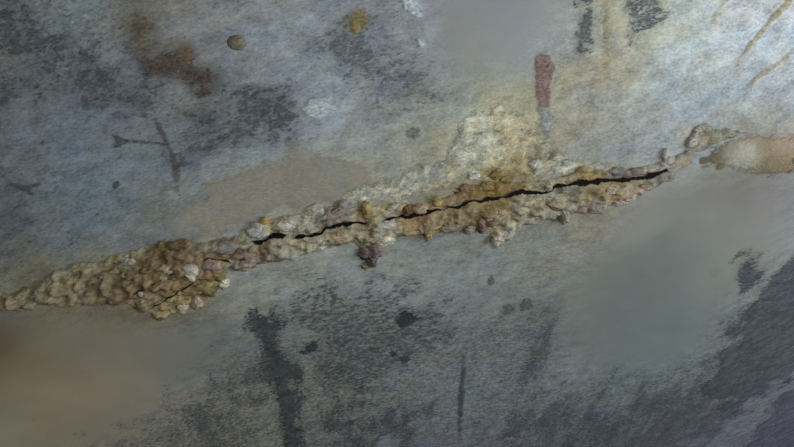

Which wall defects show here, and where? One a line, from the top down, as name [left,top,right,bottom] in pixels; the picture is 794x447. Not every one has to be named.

rust [119,15,212,98]
rust [535,54,556,107]
water stain [574,0,595,54]
water stain [625,0,670,46]
rust [743,0,794,55]
rust [749,52,792,87]
spalling [0,123,794,321]
crack [253,164,670,245]
water stain [159,274,458,447]
water stain [496,250,794,447]